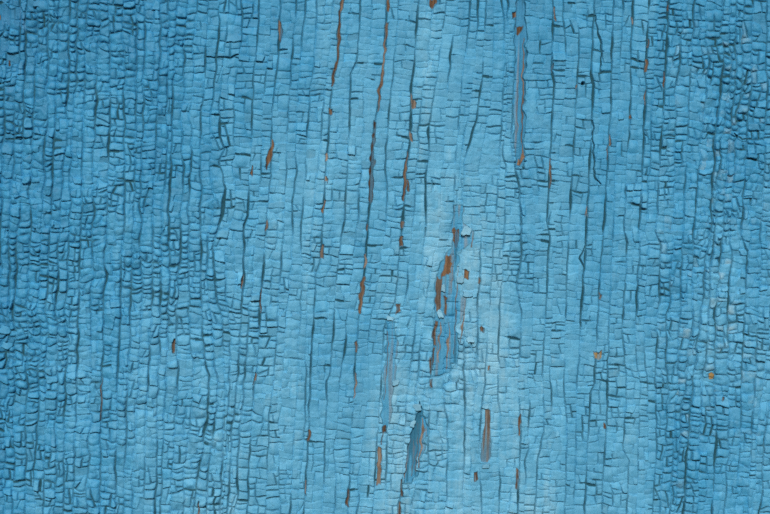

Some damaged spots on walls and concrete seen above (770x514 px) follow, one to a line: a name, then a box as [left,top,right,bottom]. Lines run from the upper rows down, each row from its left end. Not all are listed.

crack [46,124,62,264]
crack [95,267,113,421]
crack [106,119,119,176]
crack [188,0,297,514]
crack [303,0,490,514]
peeling [429,205,485,389]
crack [507,0,671,514]
crack [707,117,758,331]
peeling [404,401,430,484]
peeling [474,403,492,482]
crack [681,445,690,514]
crack [711,421,724,514]